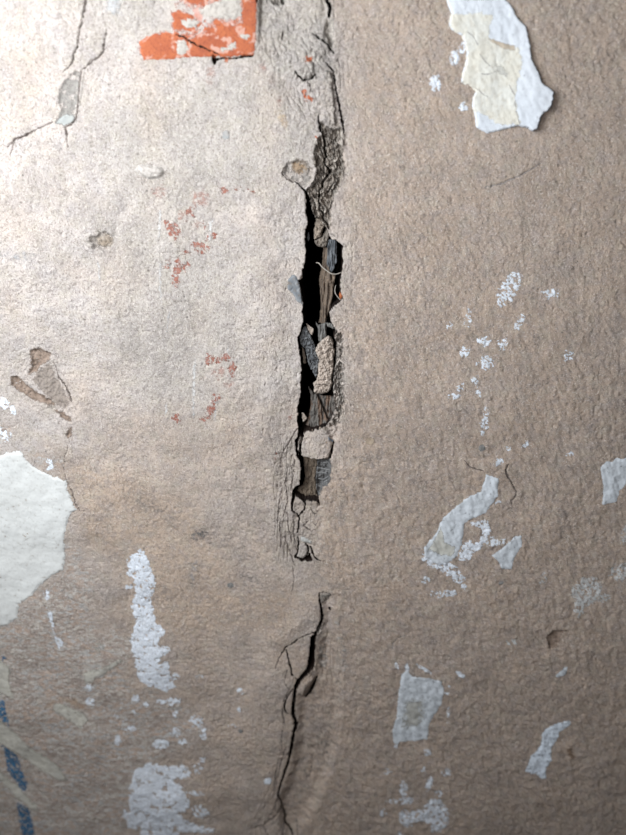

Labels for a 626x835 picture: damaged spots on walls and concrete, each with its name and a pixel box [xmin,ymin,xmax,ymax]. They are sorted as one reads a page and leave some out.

crack [324,0,332,18]
crack [295,33,345,133]
peeling [429,74,441,92]
peeling [449,41,466,66]
peeling [0,396,16,415]
spalling [11,347,72,438]
crack [277,164,344,591]
peeling [422,520,509,598]
crack [248,591,331,835]
peeling [185,790,214,834]